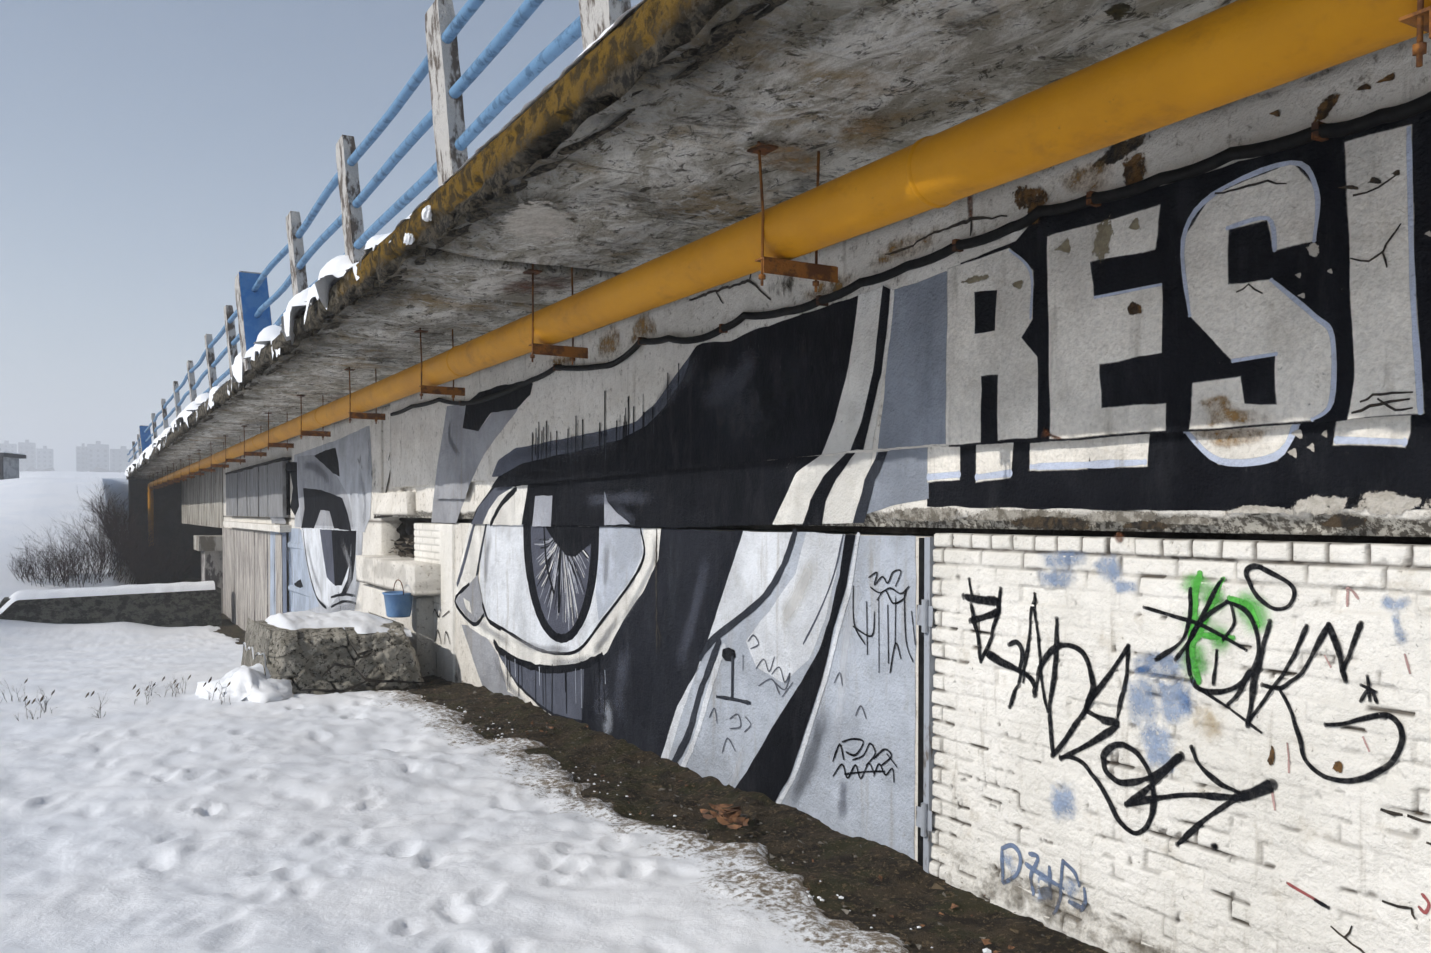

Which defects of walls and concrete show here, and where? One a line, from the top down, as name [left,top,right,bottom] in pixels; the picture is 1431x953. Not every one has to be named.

crack [1350,223,1401,268]
crack [1351,391,1413,414]
spalling [880,490,1431,530]